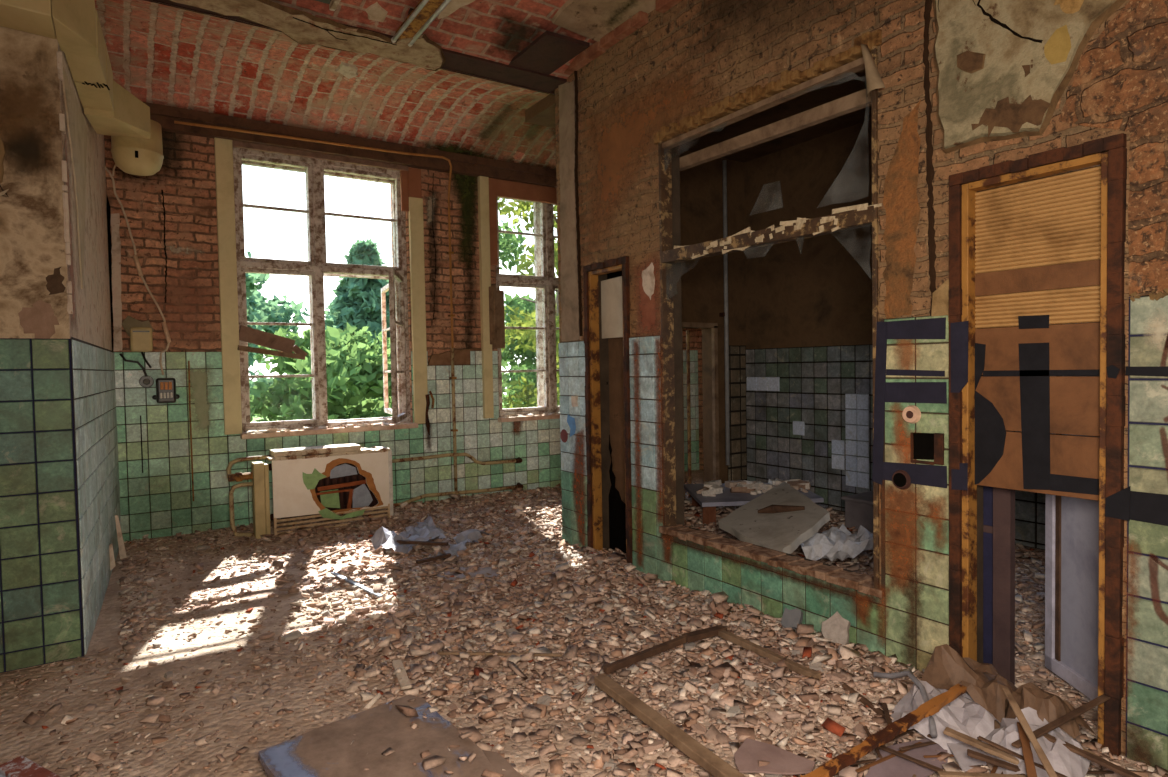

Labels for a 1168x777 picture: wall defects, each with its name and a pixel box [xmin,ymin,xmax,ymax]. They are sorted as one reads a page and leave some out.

damp [0,81,55,173]
spalling [257,0,400,44]
crack [923,0,939,316]
crack [973,0,1043,43]
spalling [932,0,1168,302]
spalling [931,279,949,322]
rust [634,342,643,566]
rust [655,339,945,664]